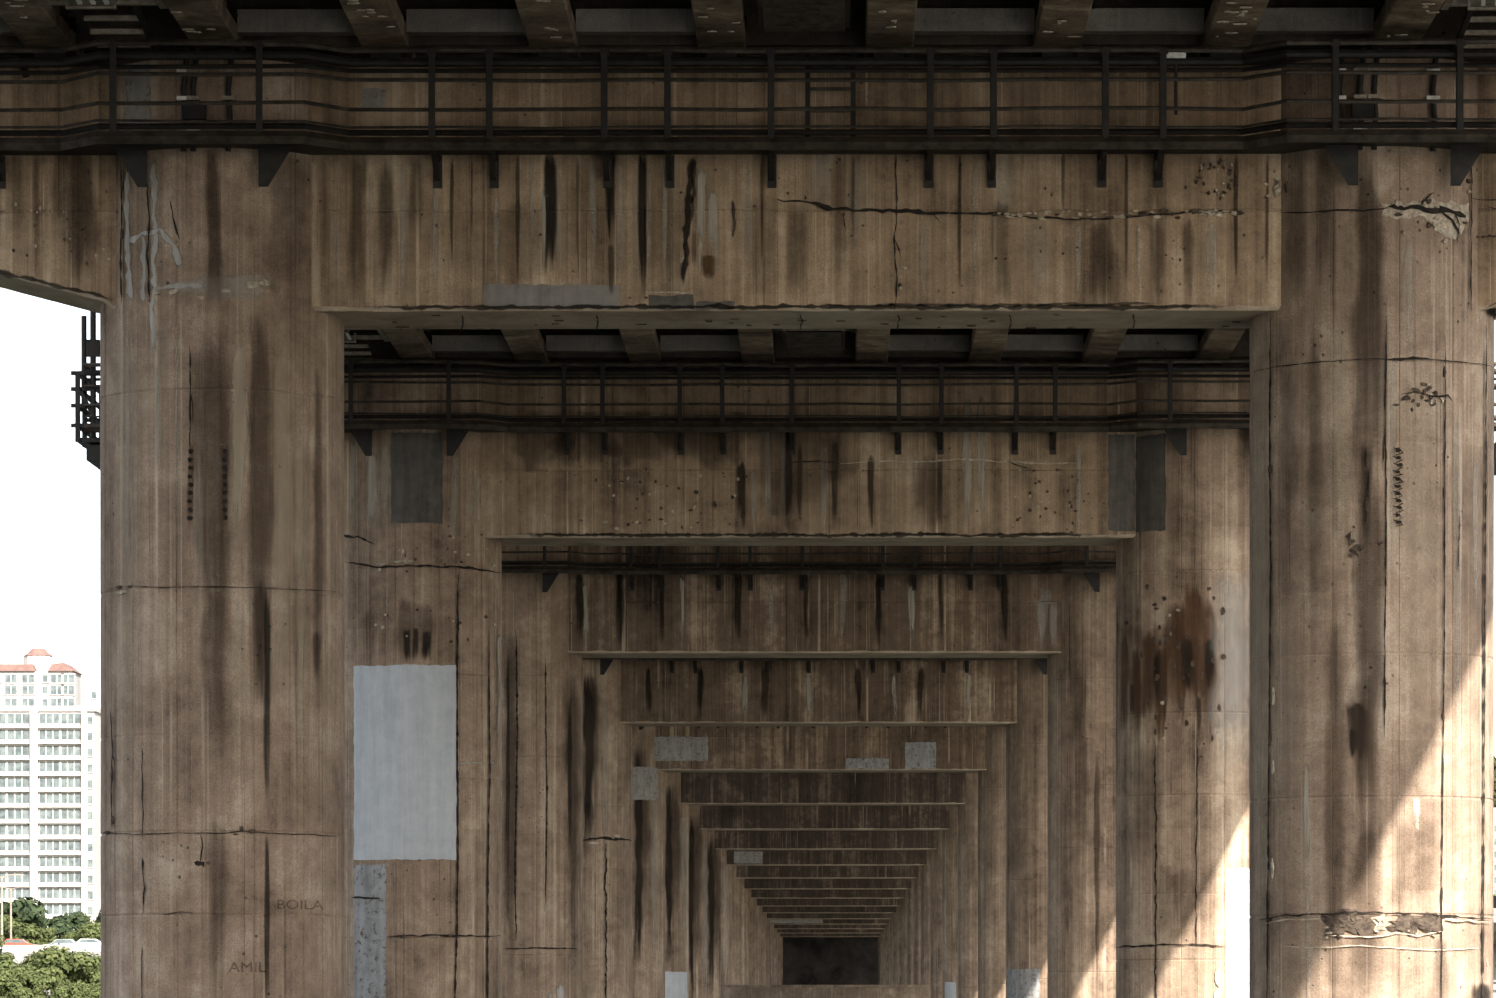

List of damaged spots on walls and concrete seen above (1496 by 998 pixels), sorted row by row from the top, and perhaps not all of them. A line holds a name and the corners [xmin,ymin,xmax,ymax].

leakage [123,160,219,347]
leakage [681,160,736,282]
crack [777,154,1017,330]
leakage [1356,173,1381,439]
spalling [1381,178,1496,243]
leakage [188,364,225,696]
leakage [255,586,270,782]
leakage [459,637,515,880]
leakage [1183,639,1213,728]
leakage [1350,501,1382,763]
spalling [1321,908,1444,939]